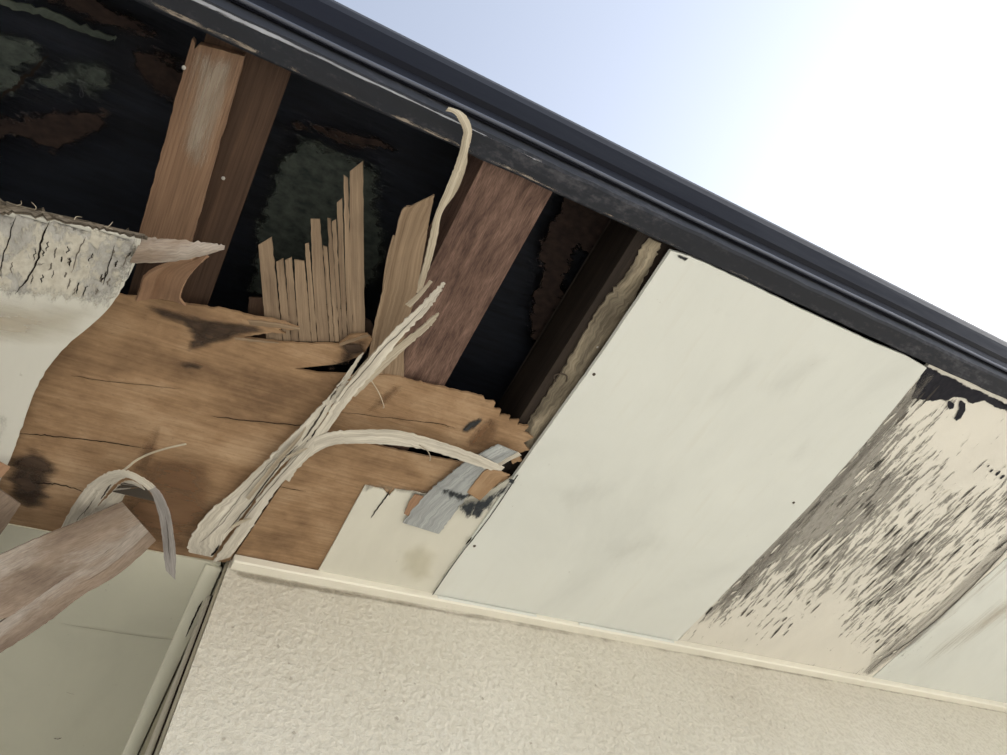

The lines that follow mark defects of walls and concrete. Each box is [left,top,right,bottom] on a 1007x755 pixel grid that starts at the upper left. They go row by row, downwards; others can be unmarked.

crack [0,214,135,305]
water stain [8,455,54,507]
peeling [404,494,423,516]
peeling [693,380,1007,661]